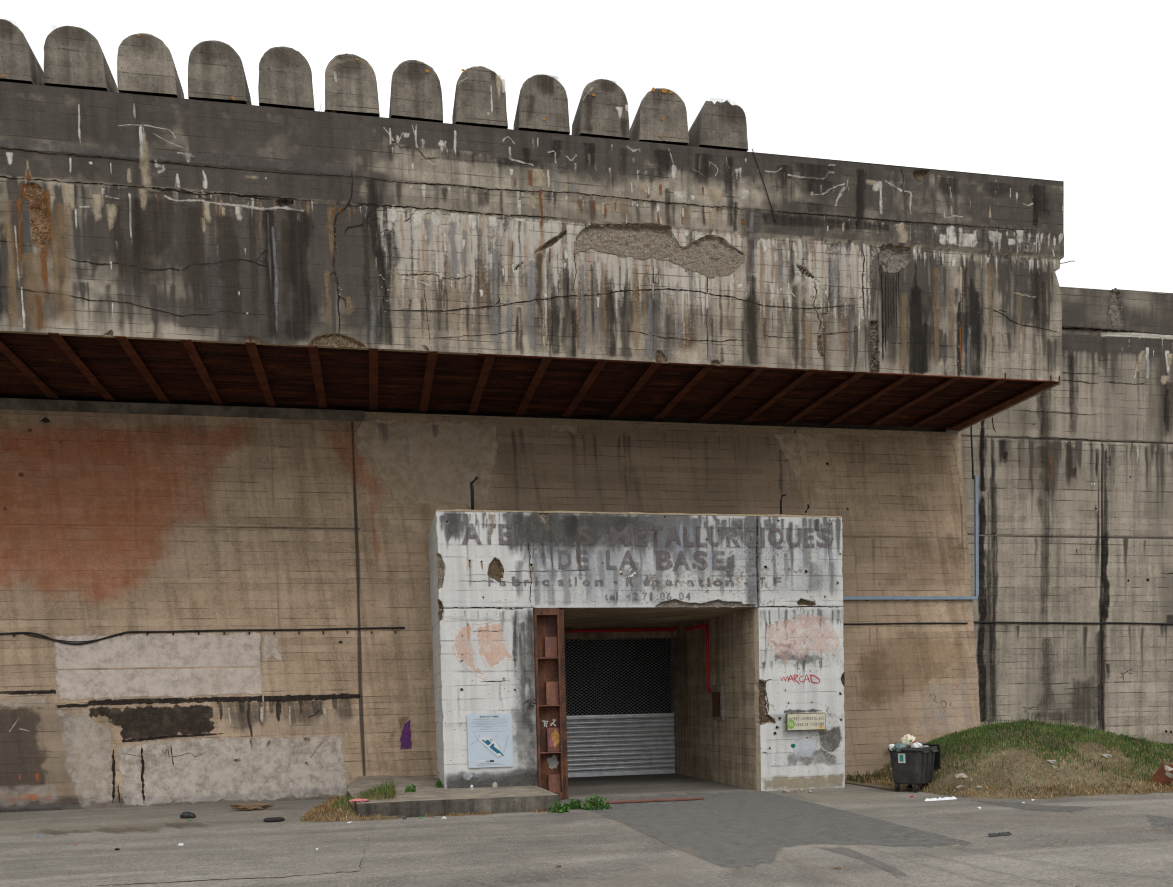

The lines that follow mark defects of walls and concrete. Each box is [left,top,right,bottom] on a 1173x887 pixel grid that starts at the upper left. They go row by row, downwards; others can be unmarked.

corrosion [8,184,70,329]
water stain [24,104,311,338]
water stain [363,180,631,356]
crack [0,147,1037,330]
crack [395,254,858,355]
spalling [534,223,745,278]
water stain [737,164,943,372]
spalling [859,246,879,372]
spalling [468,557,505,583]
water stain [977,420,1007,722]
water stain [1036,452,1110,728]
spalling [758,679,782,749]